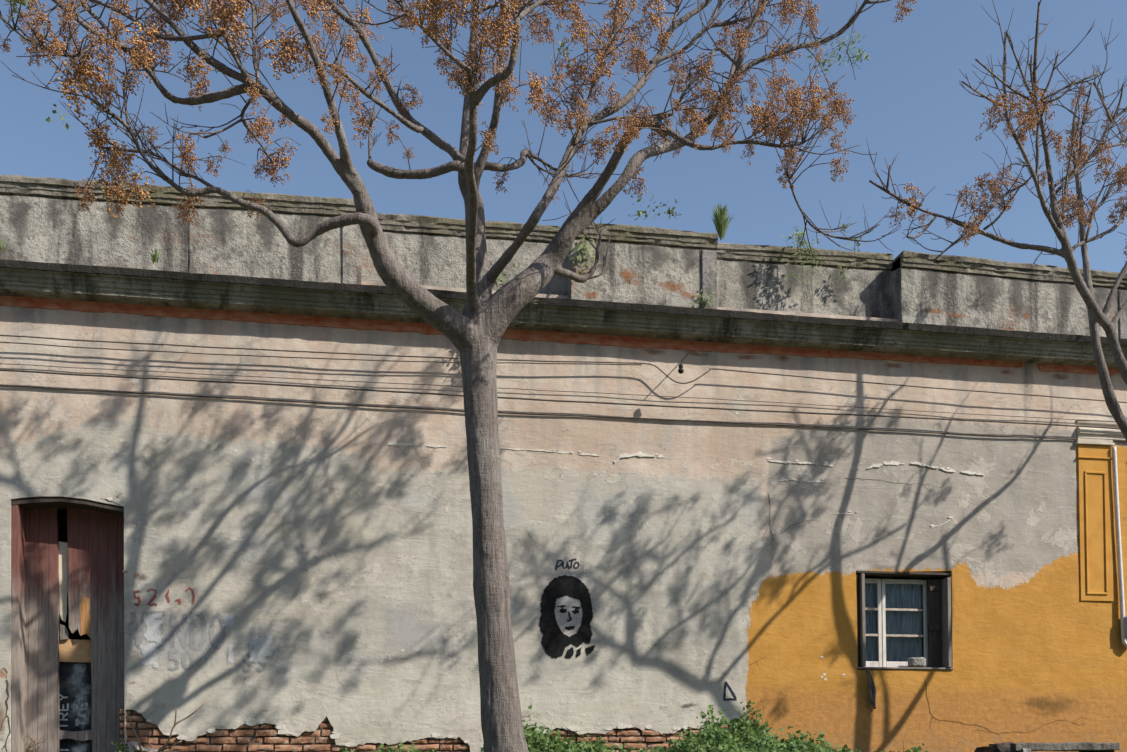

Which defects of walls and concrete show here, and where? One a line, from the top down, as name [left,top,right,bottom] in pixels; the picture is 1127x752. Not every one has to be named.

water stain [14,203,26,238]
water stain [1012,278,1022,315]
flaking render [119,708,470,752]
flaking render [541,715,744,752]